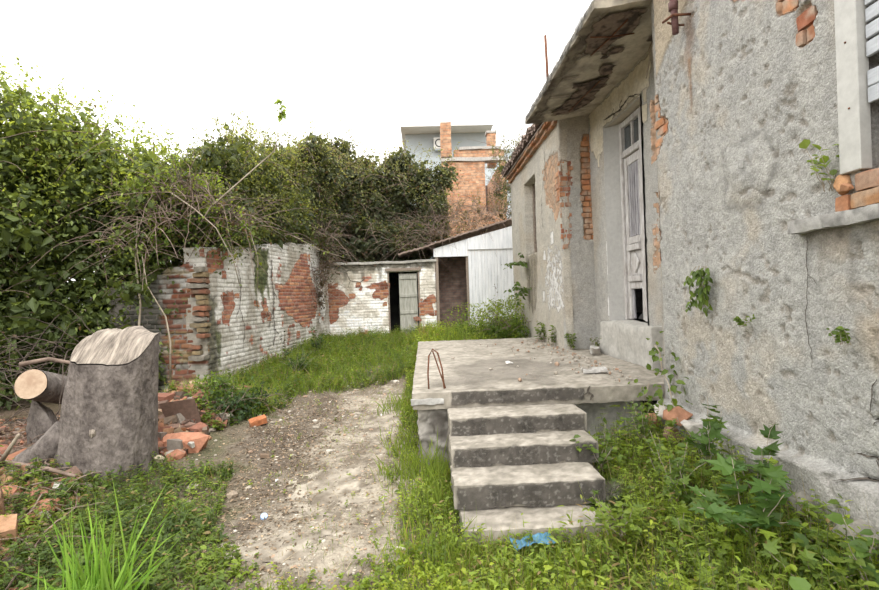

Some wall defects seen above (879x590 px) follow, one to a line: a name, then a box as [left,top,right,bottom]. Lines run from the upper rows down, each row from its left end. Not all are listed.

flaking render [776,0,818,47]
flaking render [542,9,669,312]
flaking render [254,298,271,323]
flaking render [275,253,390,339]
flaking render [413,294,437,321]
crack [805,233,817,367]